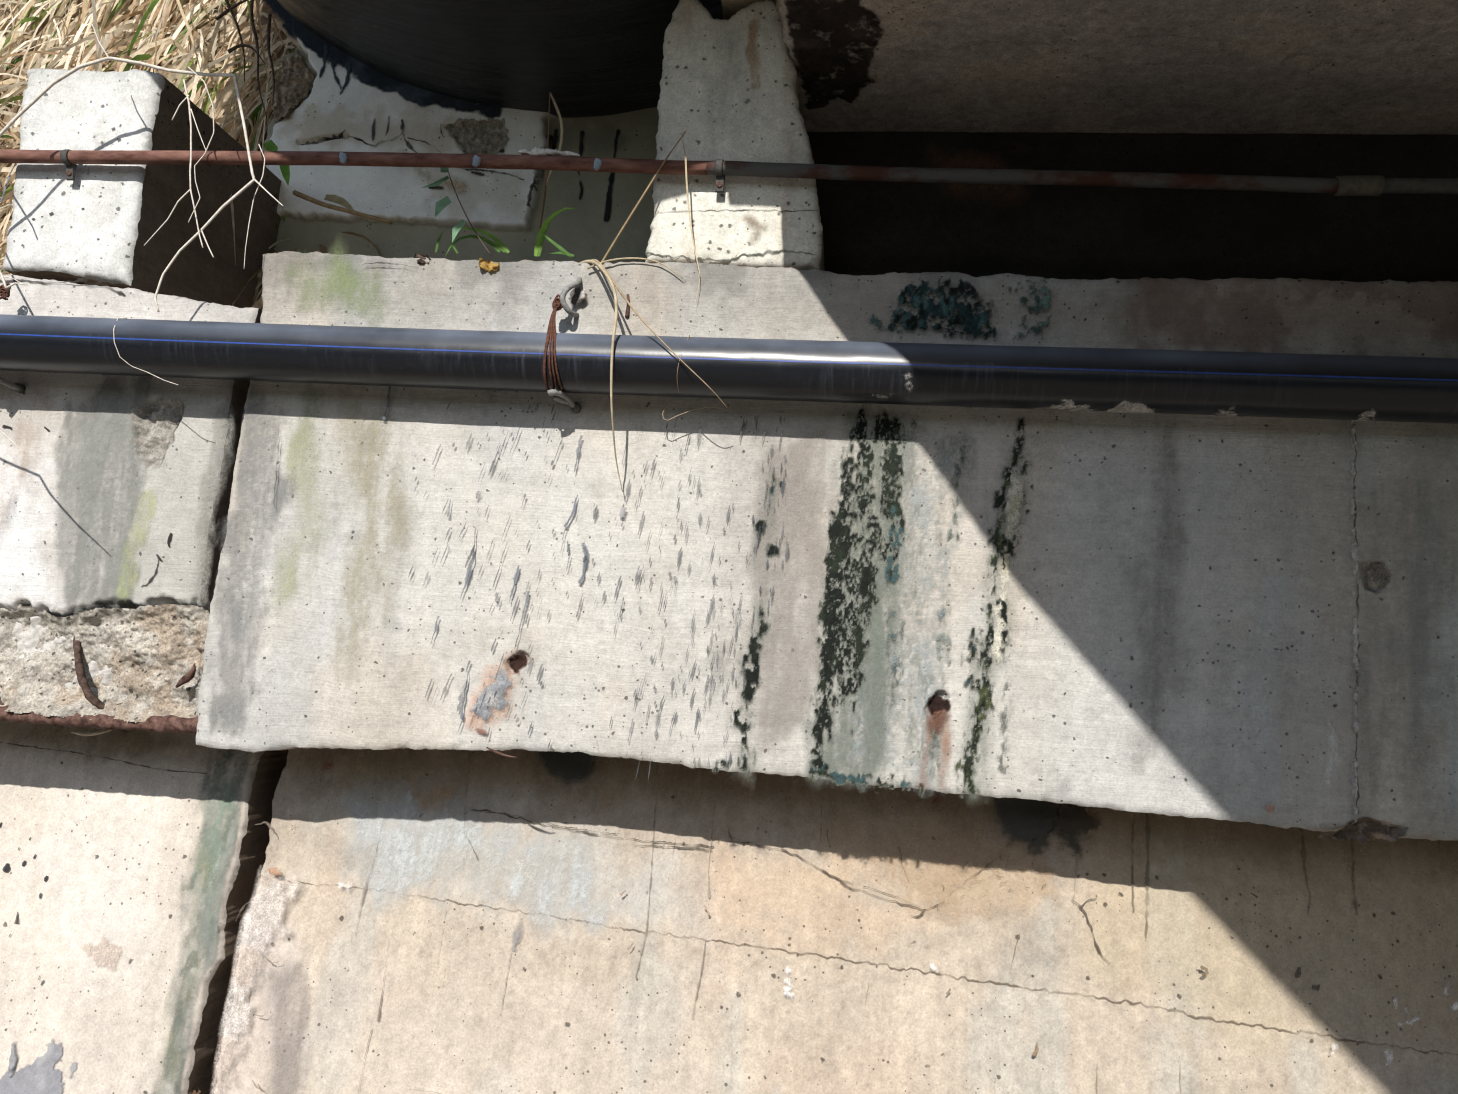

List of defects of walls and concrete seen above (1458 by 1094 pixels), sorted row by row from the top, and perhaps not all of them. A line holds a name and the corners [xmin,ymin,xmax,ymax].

spalling [0,604,210,734]
spalling [141,533,172,587]
leakage [712,408,924,794]
corrosion [928,708,949,754]
leakage [955,418,1033,795]
crack [1352,424,1360,814]
crack [464,809,994,918]
crack [1071,898,1102,956]